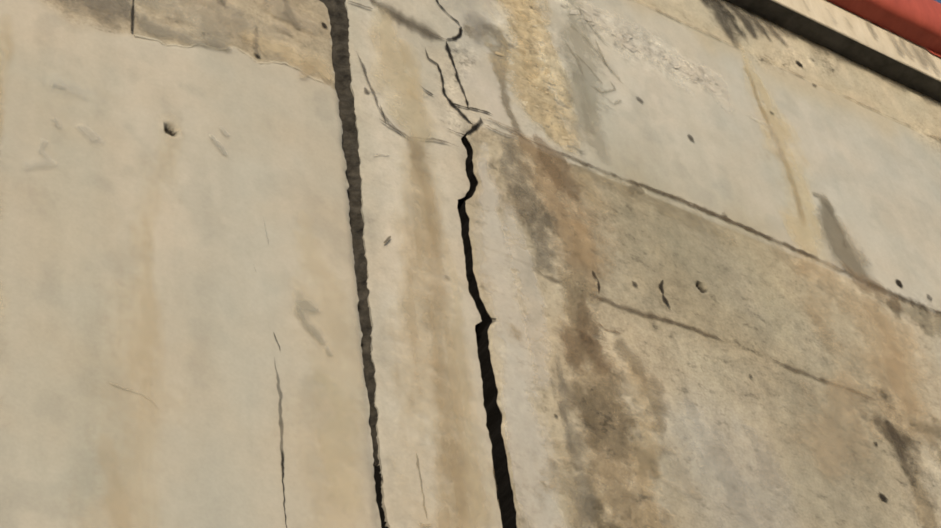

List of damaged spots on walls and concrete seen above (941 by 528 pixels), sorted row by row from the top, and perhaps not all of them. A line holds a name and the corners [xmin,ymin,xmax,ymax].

peeling [495,0,573,150]
water stain [703,0,785,43]
crack [347,0,530,528]
crack [280,449,288,527]